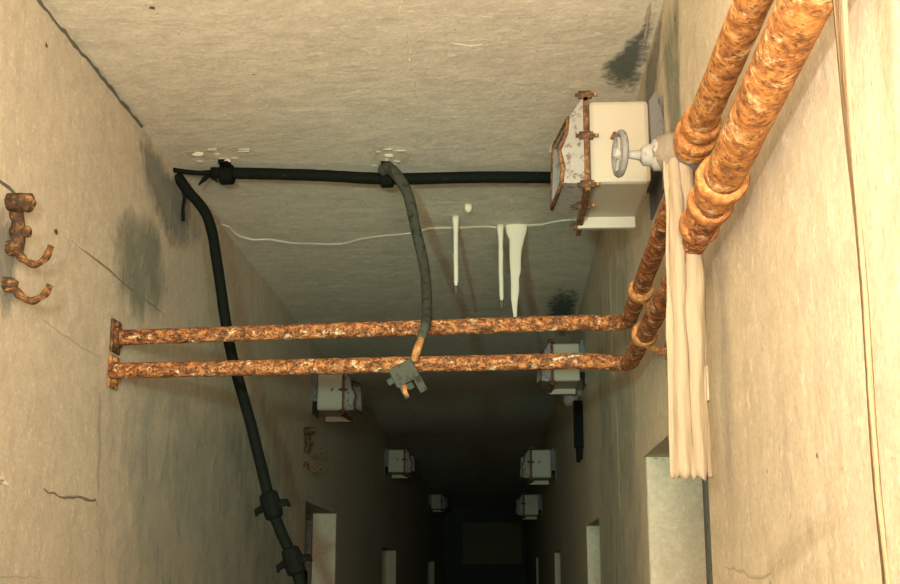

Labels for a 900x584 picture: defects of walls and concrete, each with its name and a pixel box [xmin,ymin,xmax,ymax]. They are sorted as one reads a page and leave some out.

water stain [605,3,679,132]
water stain [122,149,191,308]
crack [44,488,105,584]